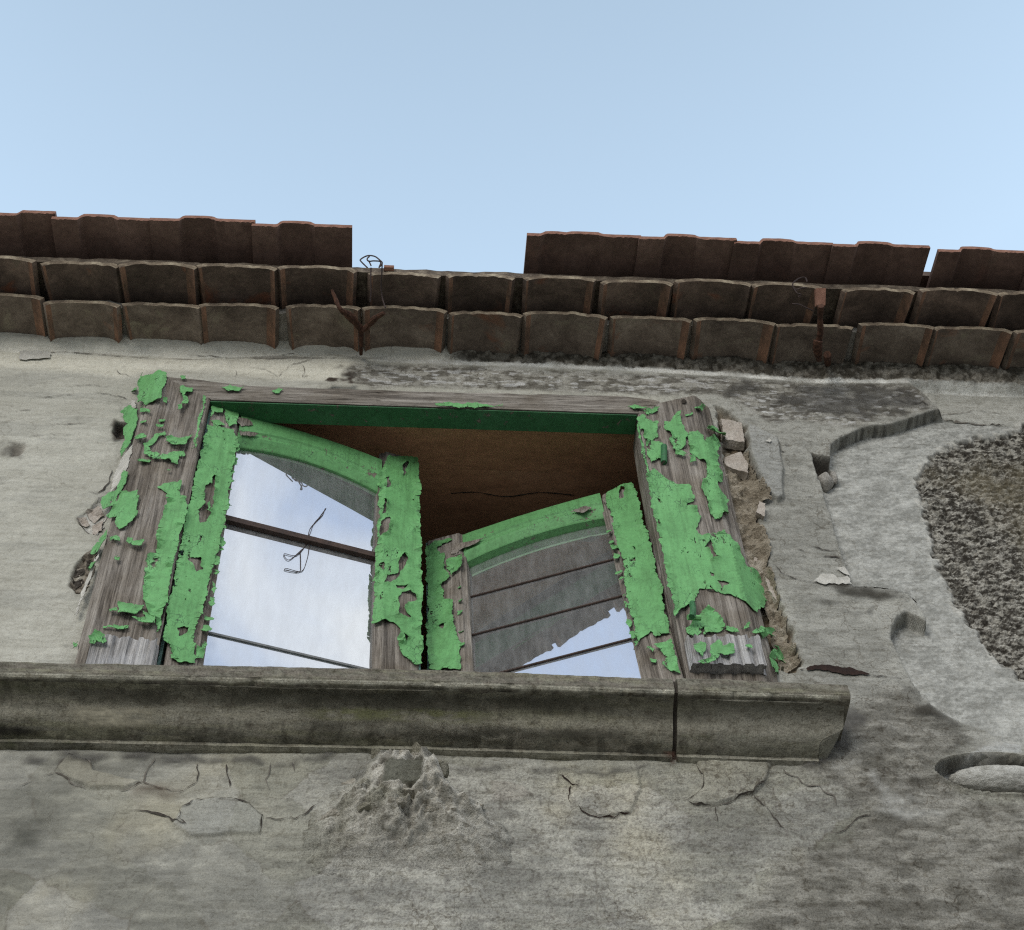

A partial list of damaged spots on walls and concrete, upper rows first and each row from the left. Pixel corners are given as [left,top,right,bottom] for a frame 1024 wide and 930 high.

peeling [70,370,259,663]
peeling [371,455,484,670]
peeling [602,404,801,675]
spalling [813,567,852,584]
crack [21,753,92,788]
crack [124,756,318,831]
crack [559,774,628,818]
crack [688,764,869,833]